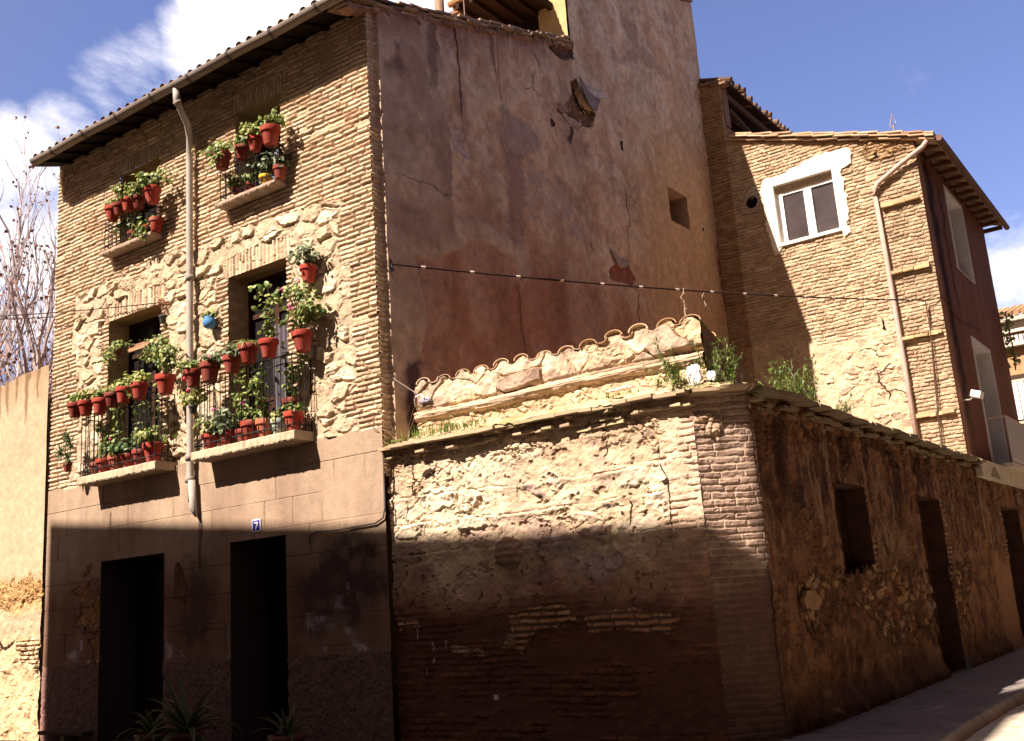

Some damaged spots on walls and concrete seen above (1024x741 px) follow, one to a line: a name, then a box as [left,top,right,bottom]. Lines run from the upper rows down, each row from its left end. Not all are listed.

spalling [557,76,608,144]
peeling [609,249,635,285]
crack [860,348,906,399]
spalling [0,571,44,612]
damp [303,536,385,654]
spalling [502,603,680,654]
spalling [792,563,940,653]